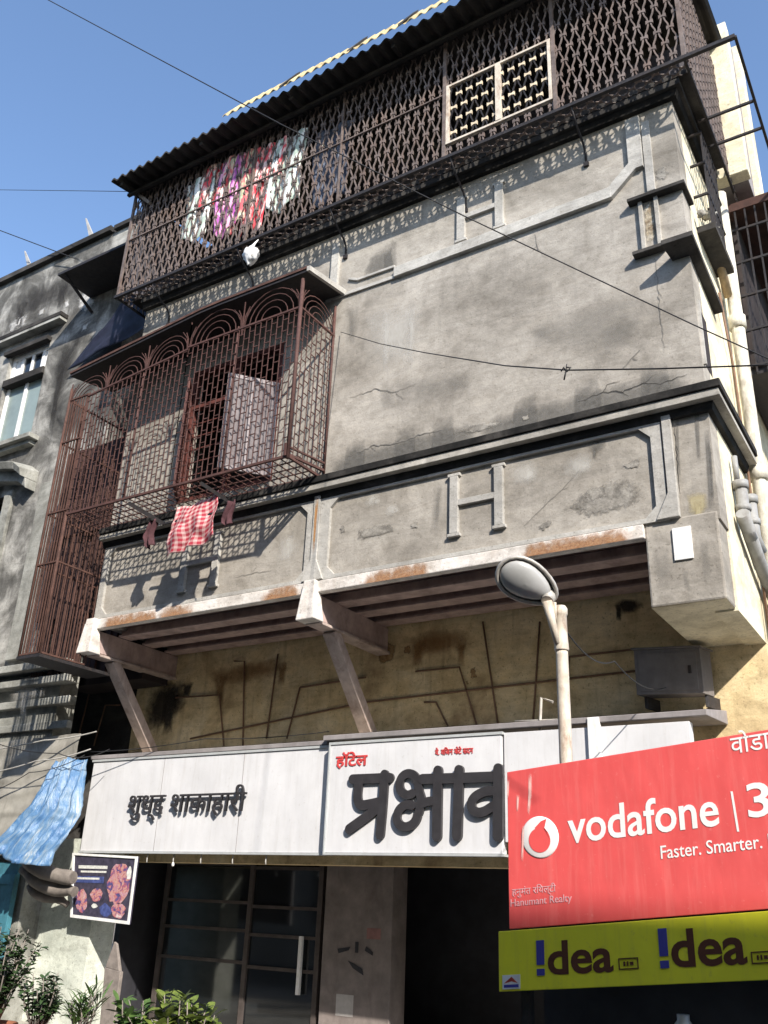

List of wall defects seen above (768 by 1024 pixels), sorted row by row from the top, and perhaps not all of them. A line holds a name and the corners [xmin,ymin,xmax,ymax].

crack [578,258,687,402]
flaking render [570,459,639,517]
rust [526,533,625,557]
rust [366,566,425,583]
rust [106,607,190,627]
damp [164,684,192,729]